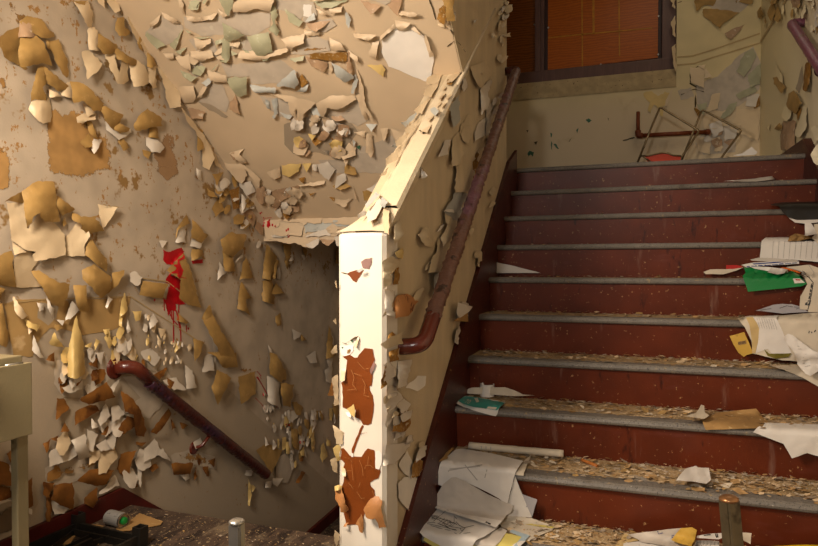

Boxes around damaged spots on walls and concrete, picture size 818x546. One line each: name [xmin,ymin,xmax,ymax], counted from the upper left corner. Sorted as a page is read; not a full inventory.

peeling [492,1,513,64]
peeling [694,0,818,39]
peeling [0,0,504,319]
peeling [454,301,472,344]
peeling [0,181,427,546]
peeling [479,348,798,369]
peeling [473,394,818,425]
peeling [439,447,818,504]
peeling [500,515,643,546]